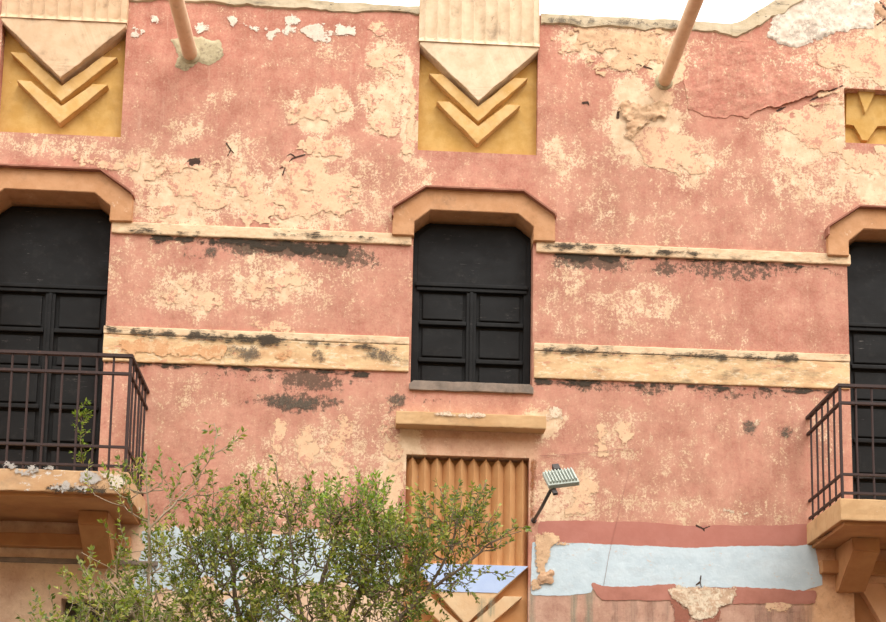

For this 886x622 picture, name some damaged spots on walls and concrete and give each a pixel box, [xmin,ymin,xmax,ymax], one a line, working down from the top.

peeling [227,14,356,43]
peeling [570,27,671,77]
peeling [767,0,886,87]
peeling [618,54,709,176]
damp [128,227,372,258]
mould [534,345,630,357]
mould [643,352,799,364]
damp [534,378,601,387]
damp [622,382,738,392]
damp [245,395,343,410]
peeling [48,470,126,492]
spalling [591,583,817,620]